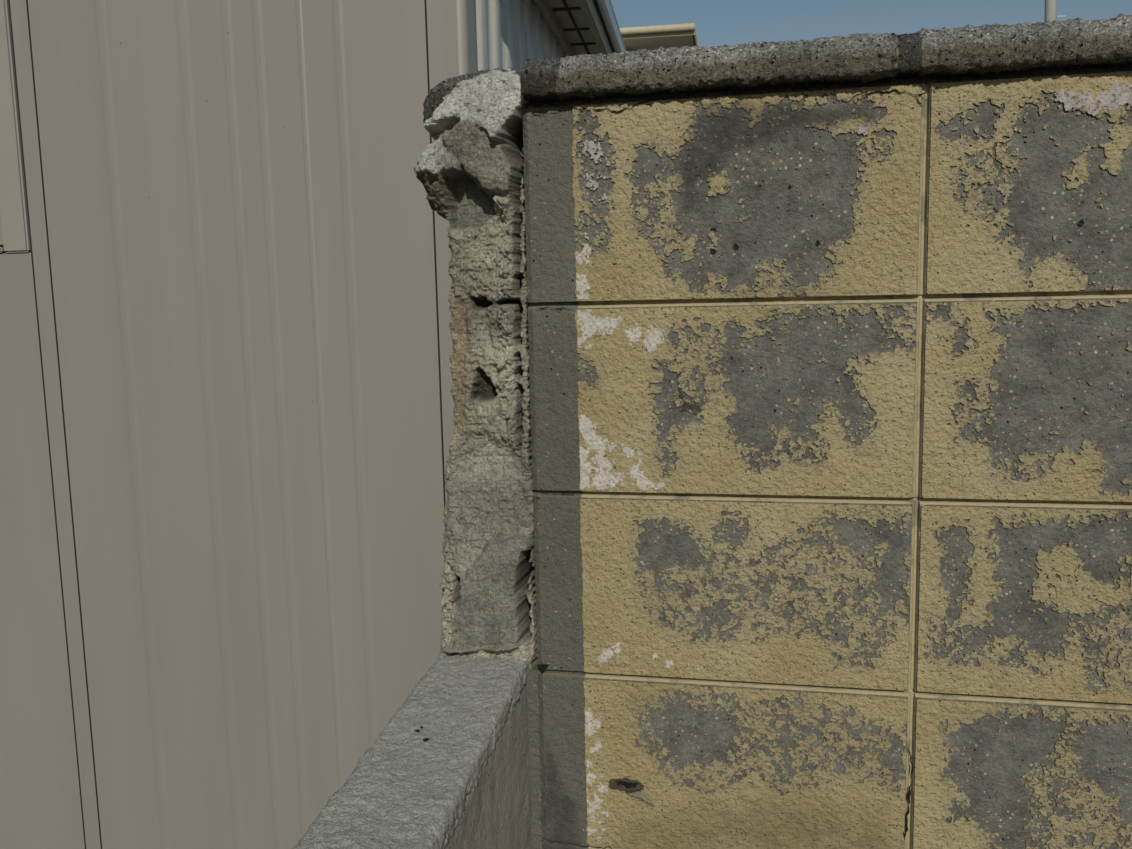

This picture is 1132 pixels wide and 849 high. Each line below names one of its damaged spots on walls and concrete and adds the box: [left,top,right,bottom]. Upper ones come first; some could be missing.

spalling [427,118,460,143]
spalling [444,106,532,477]
peeling [574,91,1132,496]
spalling [439,531,537,678]
peeling [631,505,911,670]
peeling [924,510,1132,694]
peeling [626,686,906,797]
crack [903,747,914,840]
peeling [939,705,1132,849]